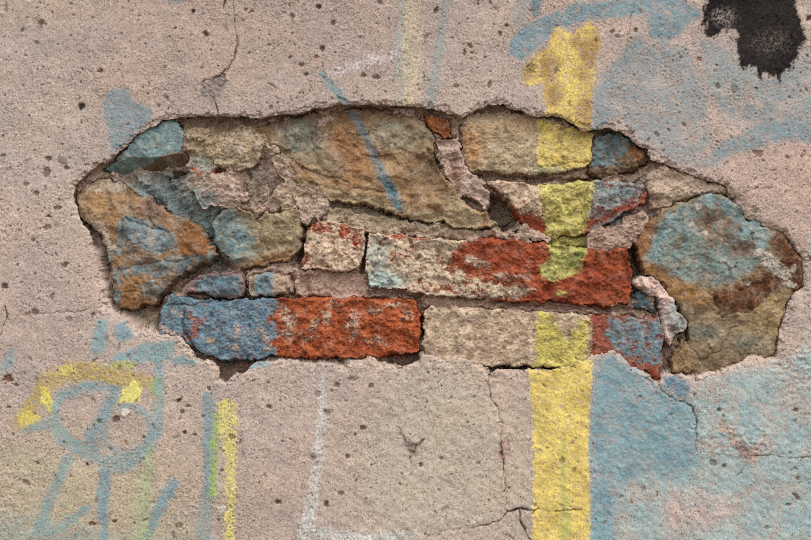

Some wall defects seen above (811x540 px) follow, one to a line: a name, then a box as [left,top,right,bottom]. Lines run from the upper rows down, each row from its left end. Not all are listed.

crack [200,0,239,117]
spalling [73,104,803,383]
crack [428,373,590,540]